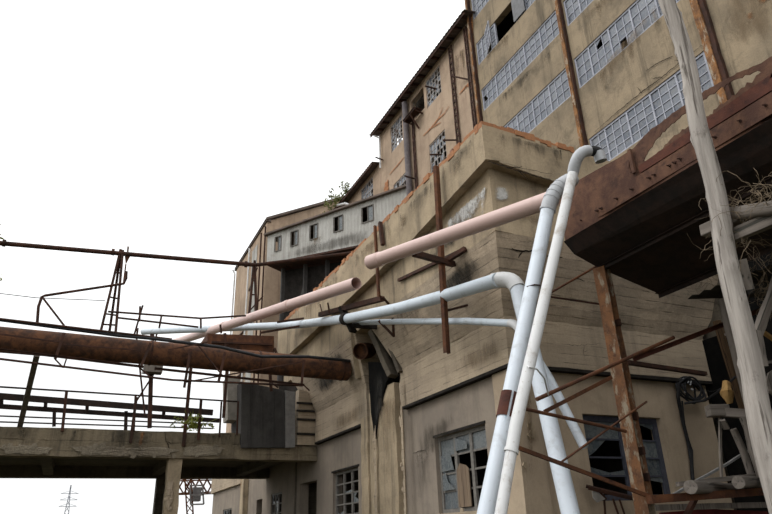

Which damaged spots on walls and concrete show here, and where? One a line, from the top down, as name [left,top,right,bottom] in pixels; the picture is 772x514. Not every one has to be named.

spalling [313,121,574,291]